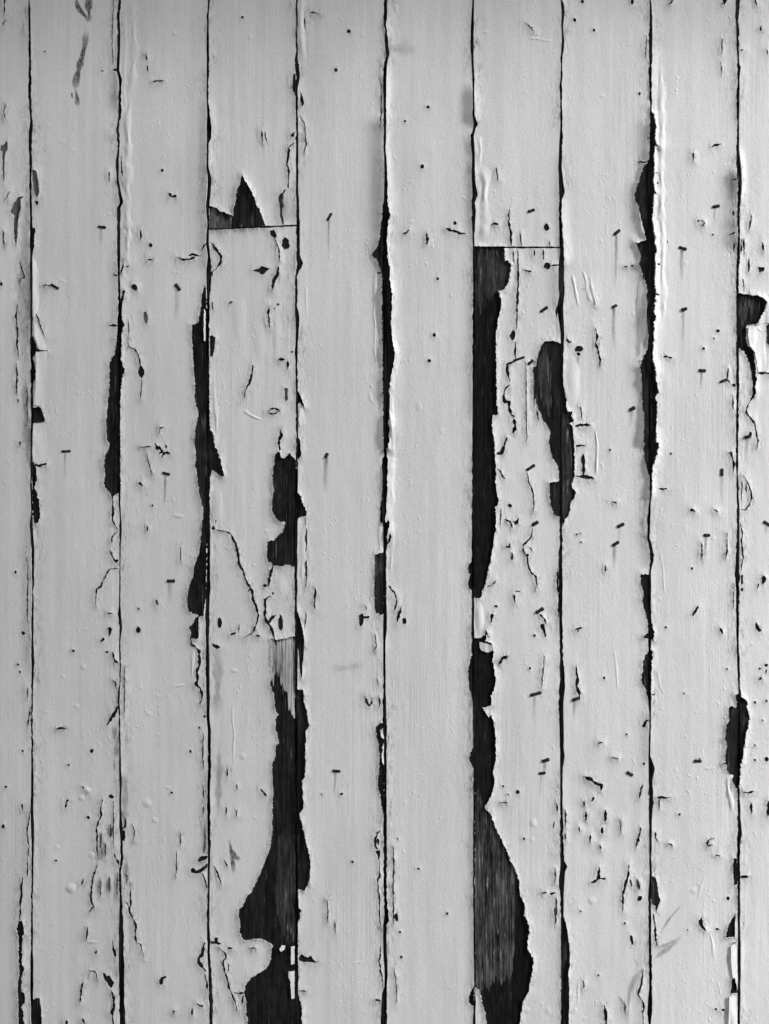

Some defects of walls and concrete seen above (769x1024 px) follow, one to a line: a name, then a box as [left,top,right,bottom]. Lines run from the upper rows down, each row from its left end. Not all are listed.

peeling [103,290,125,499]
peeling [187,271,224,640]
peeling [209,175,277,238]
crack [215,520,276,639]
peeling [267,388,307,567]
peeling [467,248,512,598]
peeling [533,341,576,524]
peeling [634,112,672,490]
peeling [738,293,769,396]
peeling [238,612,316,1024]
peeling [468,631,534,1024]
peeling [722,694,769,788]